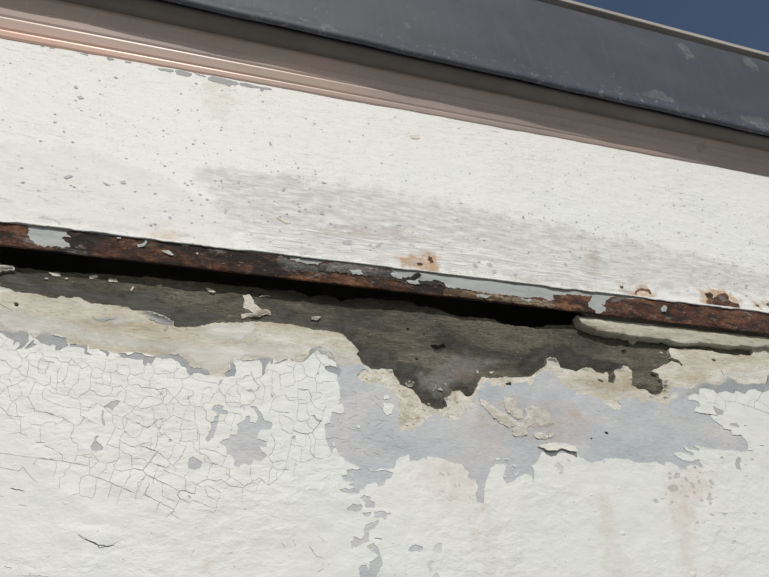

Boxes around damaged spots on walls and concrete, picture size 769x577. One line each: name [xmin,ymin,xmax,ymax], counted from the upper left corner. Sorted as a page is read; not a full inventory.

leakage [0,267,222,325]
leakage [253,293,465,406]
corrosion [0,222,769,333]
leakage [519,345,626,375]
crack [0,337,385,518]
peeling [0,263,769,577]
crack [698,377,769,465]